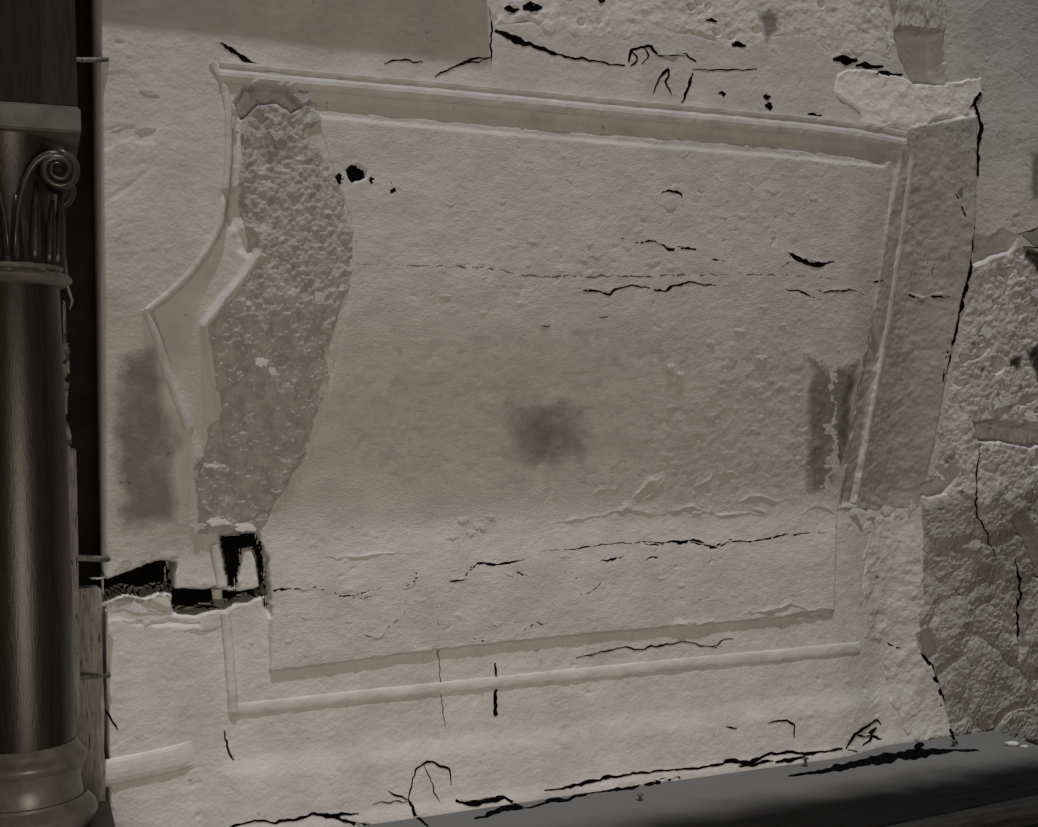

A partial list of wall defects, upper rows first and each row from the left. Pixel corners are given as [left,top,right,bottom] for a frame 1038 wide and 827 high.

crack [384,6,757,103]
flaking render [484,0,983,130]
crack [970,89,984,176]
flaking render [89,85,354,634]
crack [908,195,975,396]
flaking render [848,229,1038,741]
crack [576,638,733,658]
crack [230,719,882,827]